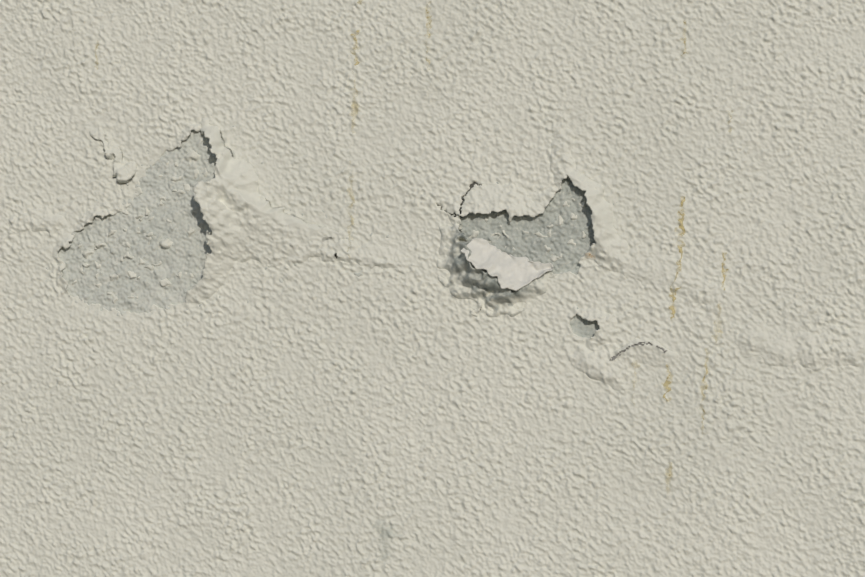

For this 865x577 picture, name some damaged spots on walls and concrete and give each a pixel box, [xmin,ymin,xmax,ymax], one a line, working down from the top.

peeling [44,110,351,316]
crack [437,182,480,218]
peeling [436,111,639,317]
peeling [570,307,617,350]
crack [610,342,667,361]